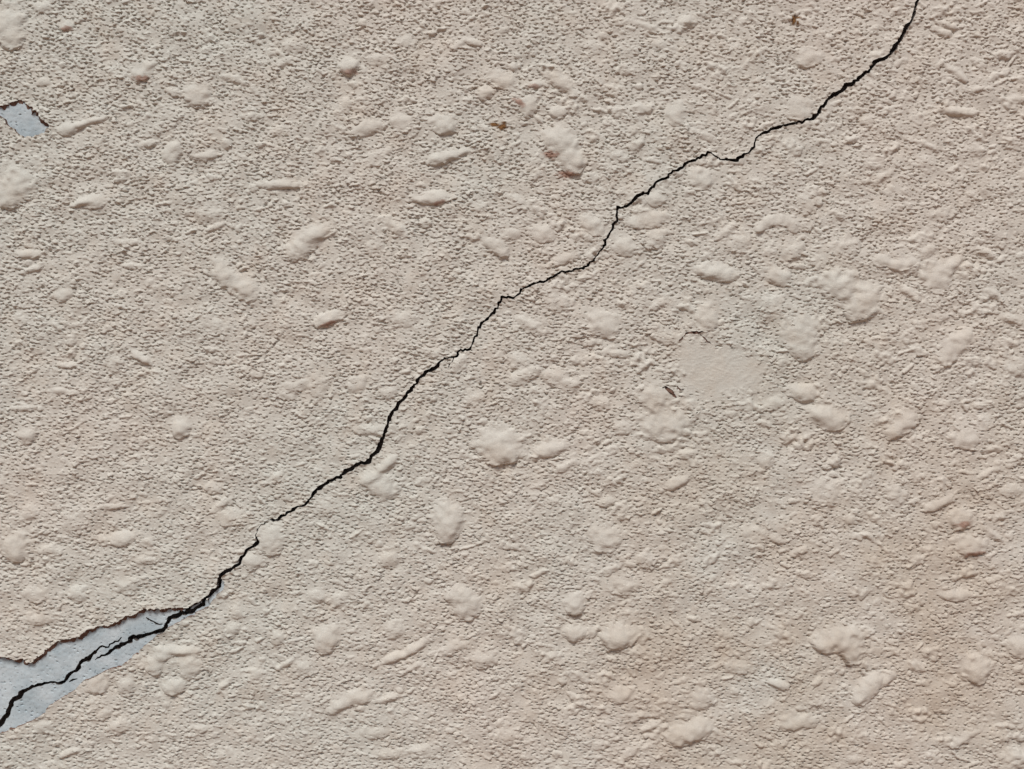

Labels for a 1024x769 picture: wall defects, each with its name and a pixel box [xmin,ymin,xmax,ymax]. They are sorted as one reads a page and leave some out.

peeling [0,100,49,138]
crack [270,0,919,521]
peeling [0,580,224,734]
crack [0,521,266,727]